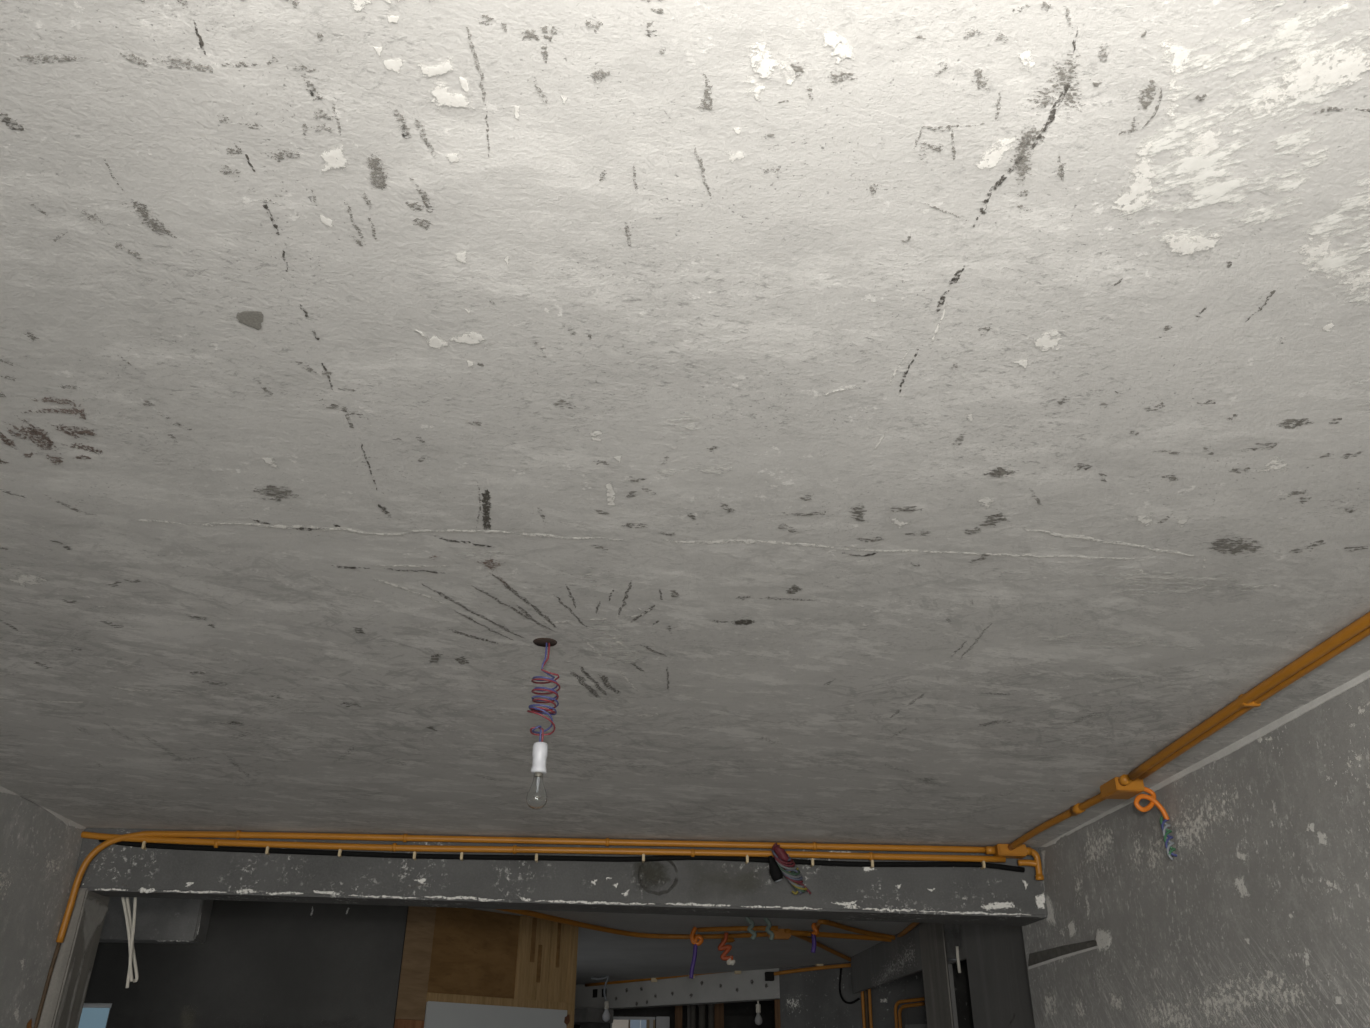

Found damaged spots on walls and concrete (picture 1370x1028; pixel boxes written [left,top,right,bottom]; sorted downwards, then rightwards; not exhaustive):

peeling [352,0,400,23]
peeling [374,47,471,110]
crack [973,85,1070,227]
peeling [1112,0,1370,256]
peeling [1299,178,1370,304]
crack [818,268,964,398]